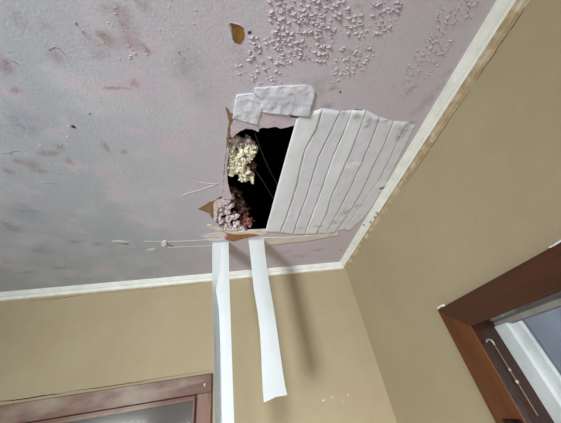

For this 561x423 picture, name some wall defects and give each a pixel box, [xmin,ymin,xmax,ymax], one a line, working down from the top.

spalling [228,22,251,44]
spalling [198,108,298,242]